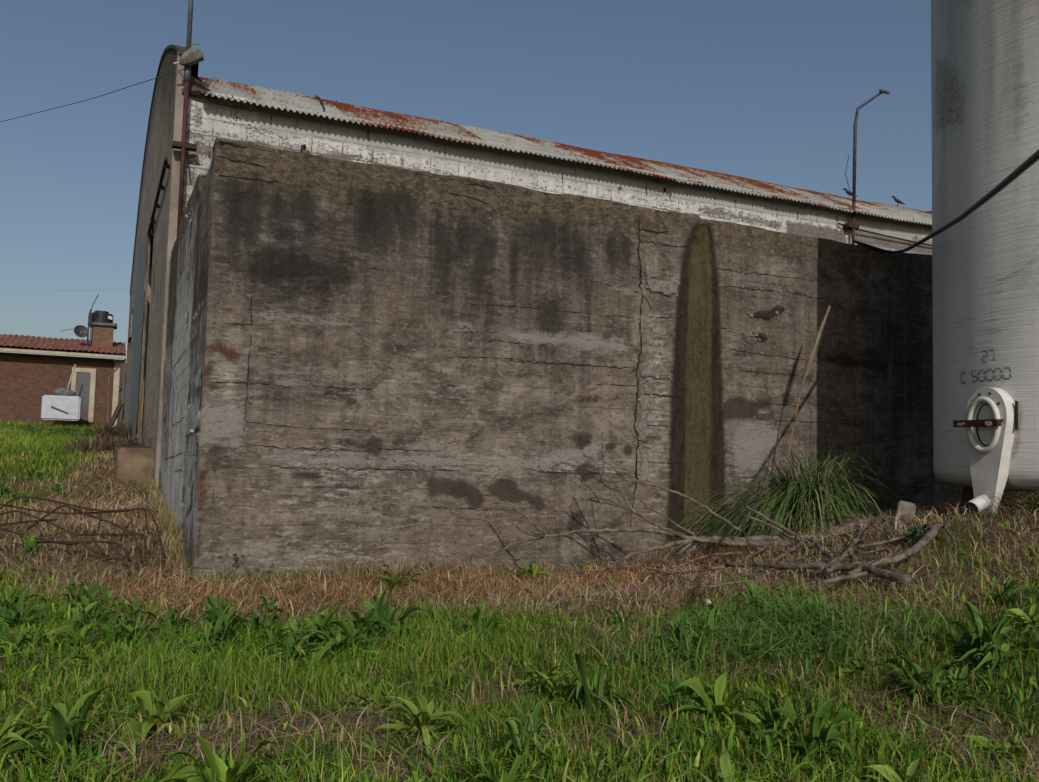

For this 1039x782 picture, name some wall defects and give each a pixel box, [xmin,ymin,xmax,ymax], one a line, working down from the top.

peeling [698,205,847,243]